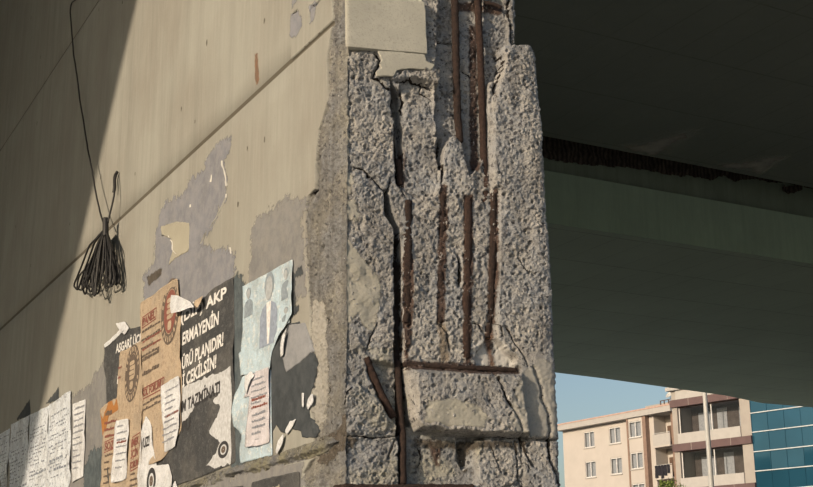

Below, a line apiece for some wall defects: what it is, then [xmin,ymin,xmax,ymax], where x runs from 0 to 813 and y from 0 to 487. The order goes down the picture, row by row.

crack [372,54,431,115]
corrosion [459,0,502,15]
crack [492,0,512,97]
peeling [142,136,236,305]
spalling [177,0,557,487]
crack [354,167,406,215]
crack [436,144,444,183]
corrosion [399,25,519,374]
spalling [542,136,813,194]
crack [326,348,394,463]
corrosion [429,441,441,466]
crack [478,374,558,484]